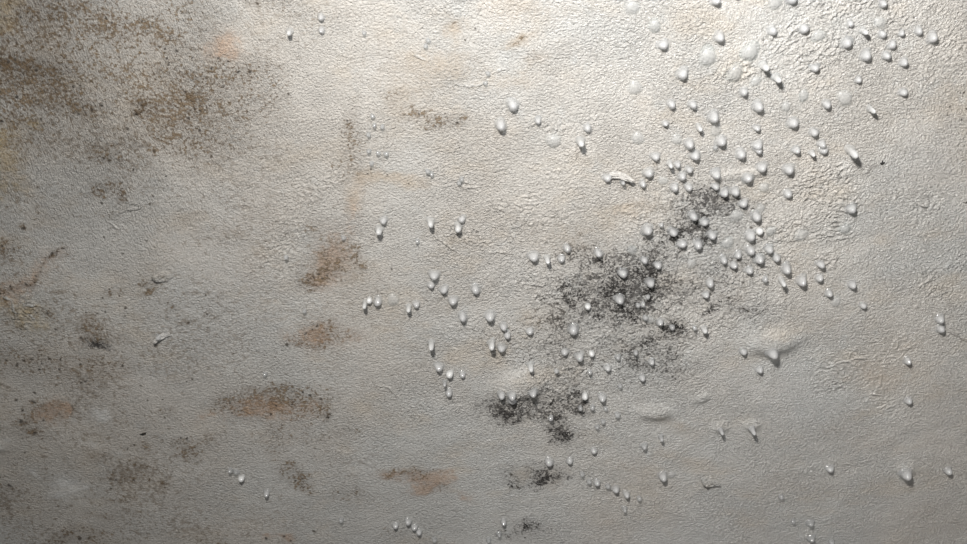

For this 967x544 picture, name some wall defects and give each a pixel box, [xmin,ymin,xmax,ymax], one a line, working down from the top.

leakage [0,0,289,177]
leakage [87,177,128,214]
leakage [475,183,761,444]